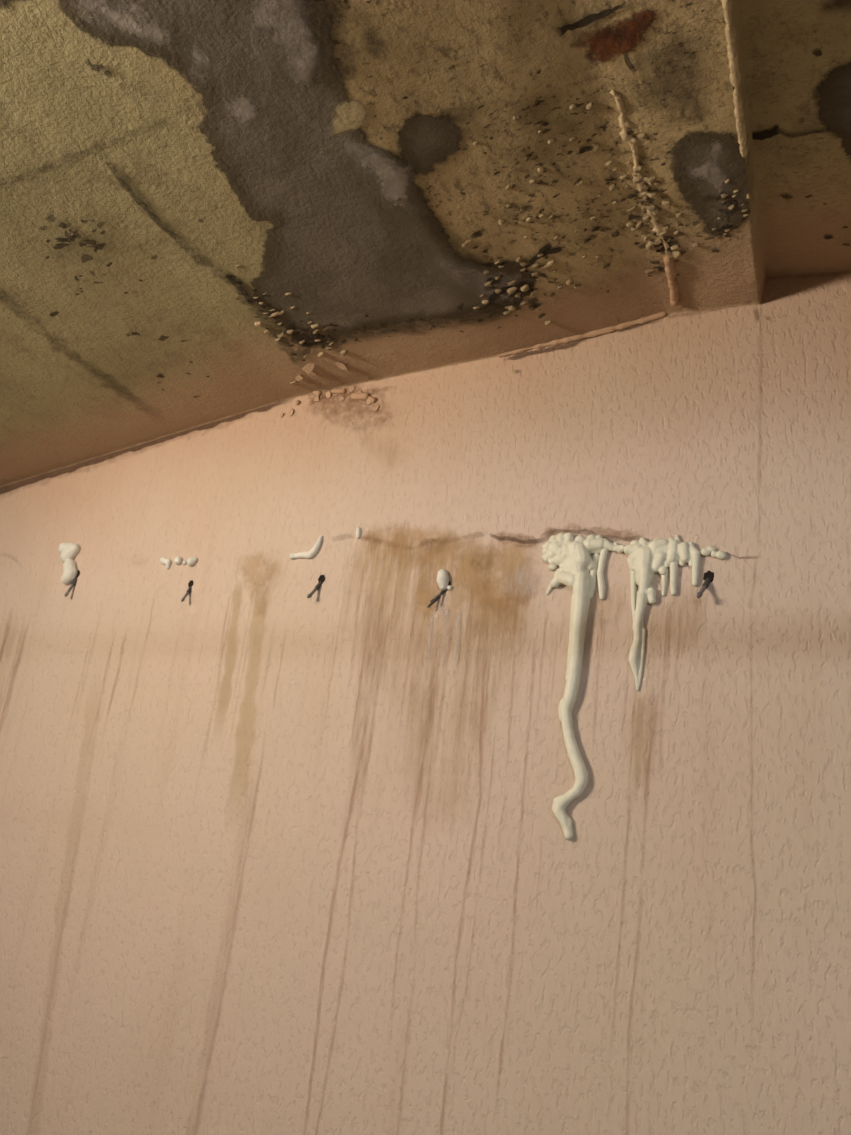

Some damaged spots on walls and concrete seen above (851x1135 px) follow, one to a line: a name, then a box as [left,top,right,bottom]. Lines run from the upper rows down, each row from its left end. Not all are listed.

corrosion [558,3,657,72]
water stain [813,63,851,159]
water stain [59,0,536,347]
water stain [669,130,750,237]